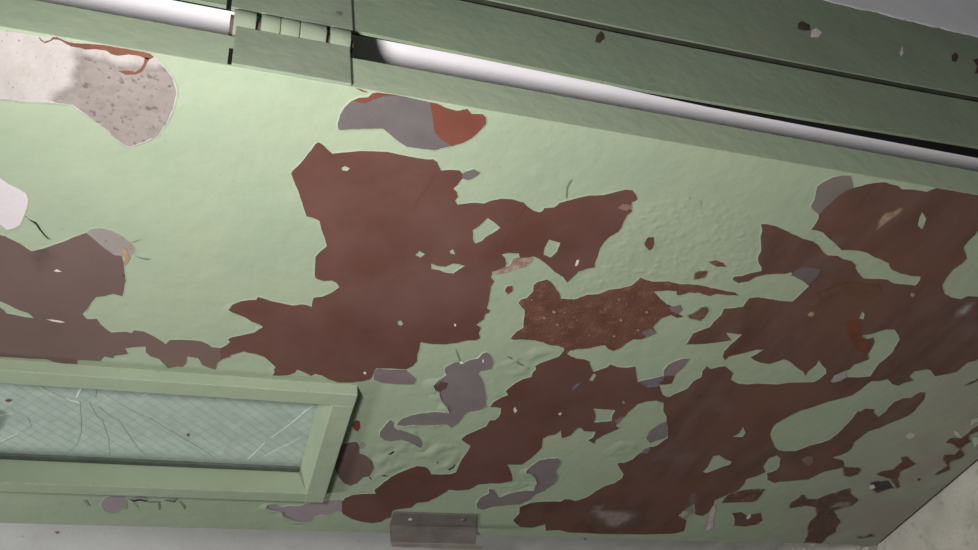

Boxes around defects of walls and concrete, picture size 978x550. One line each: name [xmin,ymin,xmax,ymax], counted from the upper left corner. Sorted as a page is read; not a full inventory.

peeling [0,30,179,149]
peeling [336,92,488,151]
peeling [0,141,978,543]
corrosion [509,260,740,353]
corrosion [869,455,919,493]
corrosion [932,418,978,476]